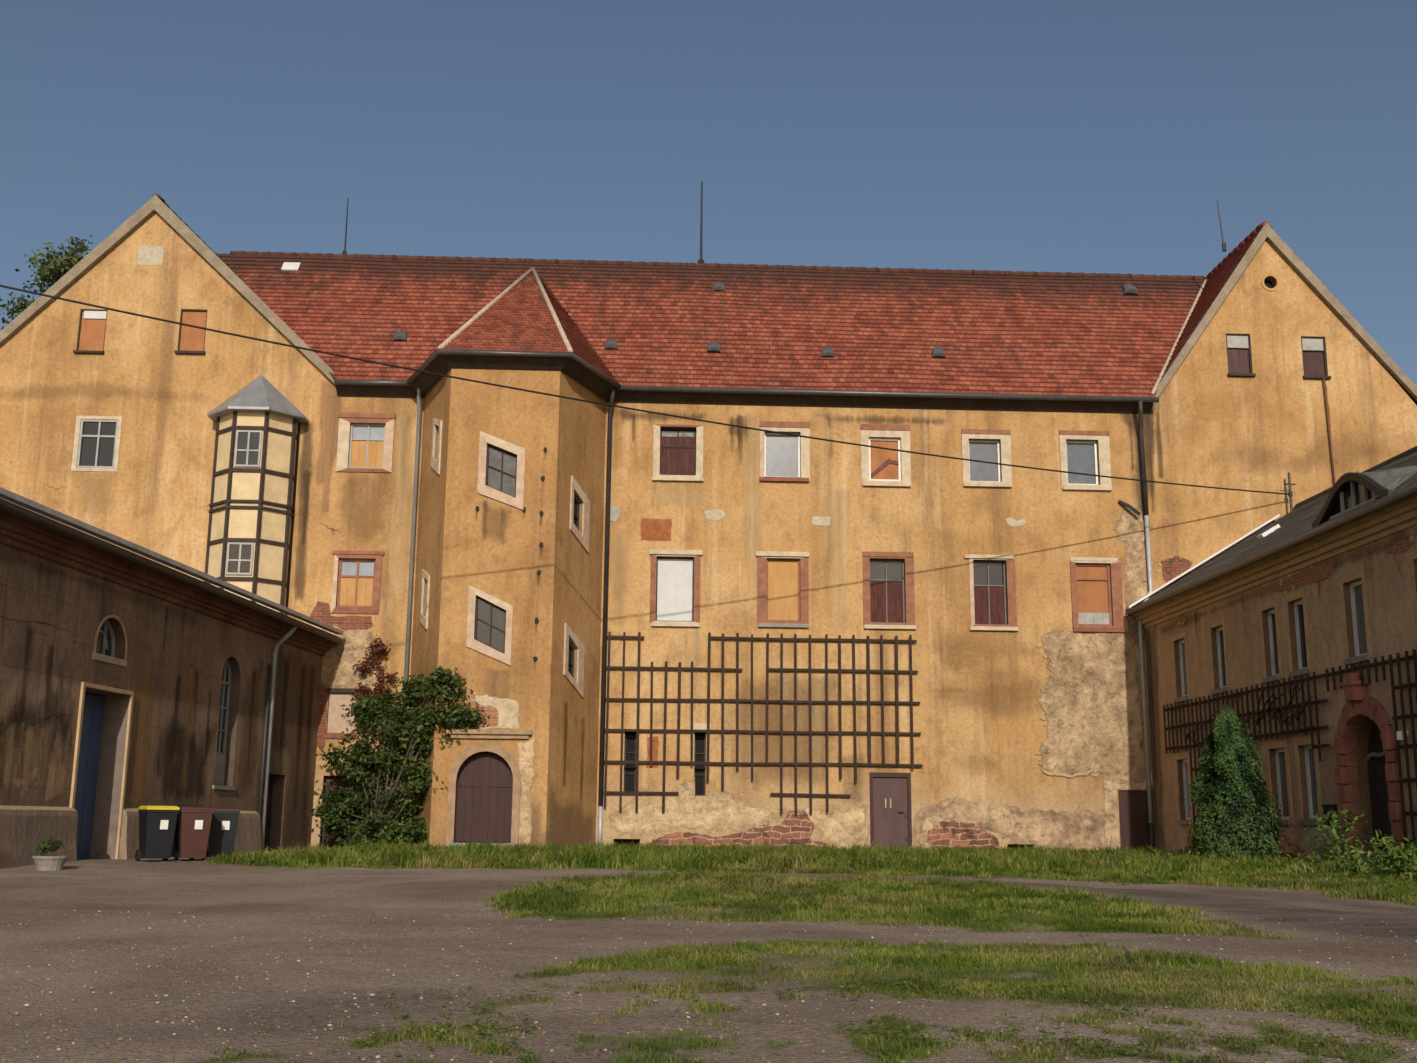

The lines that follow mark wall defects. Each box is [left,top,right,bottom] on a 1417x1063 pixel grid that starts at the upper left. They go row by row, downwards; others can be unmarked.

damp [0,647,70,753]
flaking render [912,507,1192,852]
flaking render [610,777,869,849]